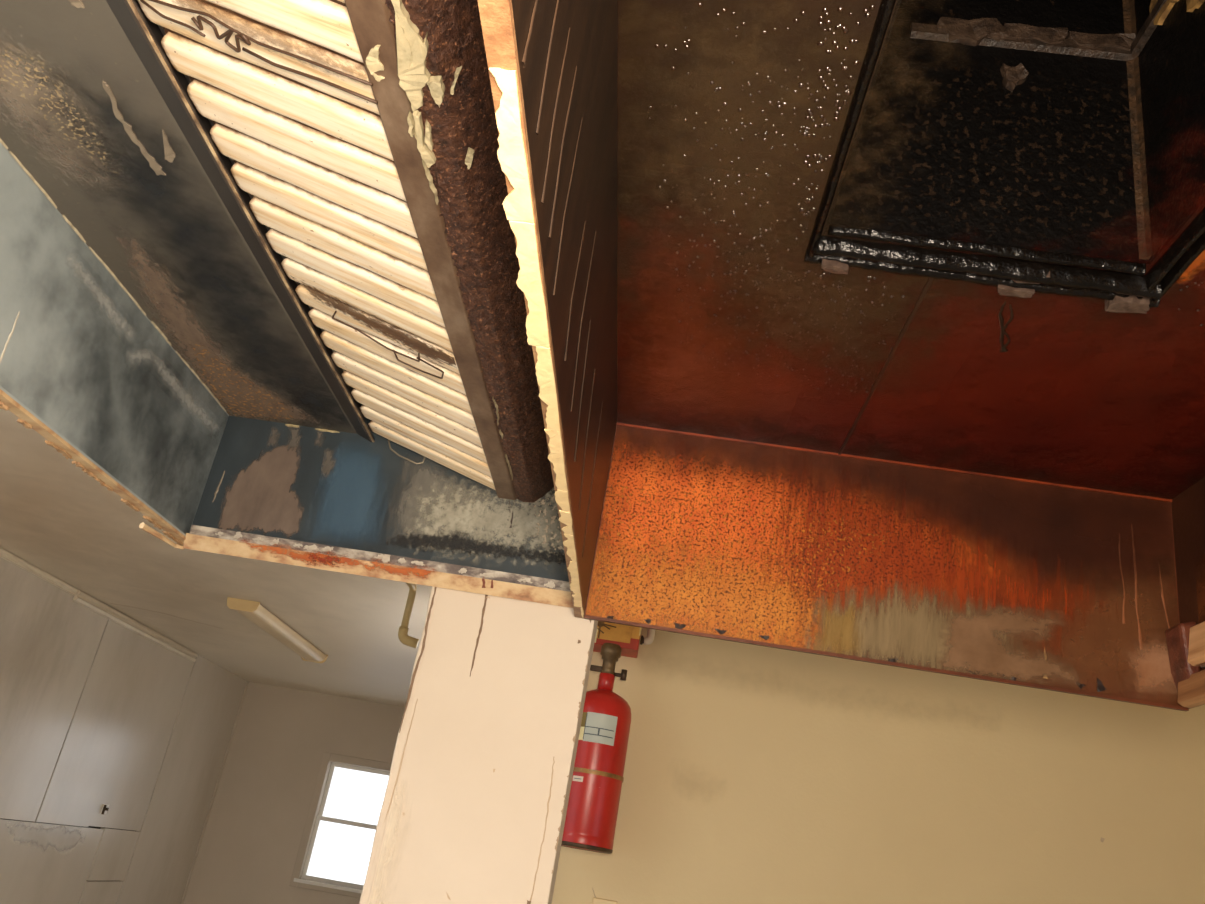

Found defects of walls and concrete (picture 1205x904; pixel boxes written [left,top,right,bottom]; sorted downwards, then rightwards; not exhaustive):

peeling [102,81,176,176]
peeling [366,0,462,205]
peeling [465,147,474,169]
peeling [0,138,226,412]
peeling [489,67,591,623]
peeling [45,440,184,550]
peeling [212,424,340,552]
rust [242,540,435,579]
peeling [374,554,425,566]
rust [588,441,1178,692]
crack [470,595,490,676]
crack [527,758,555,904]